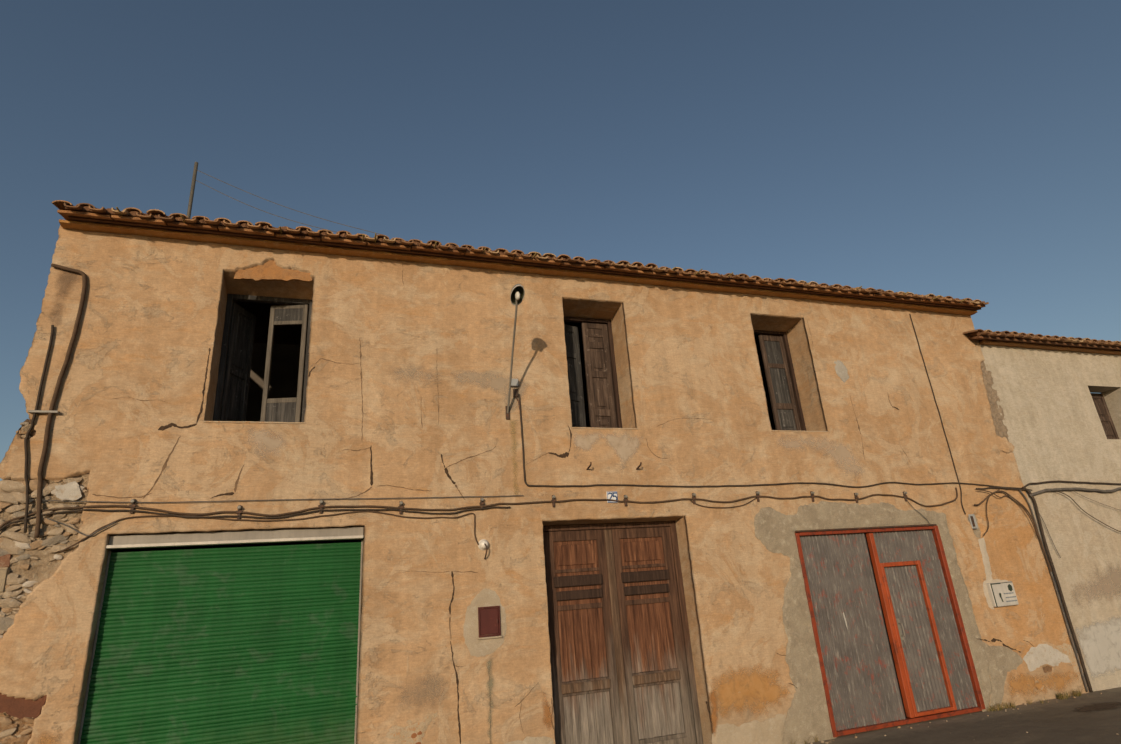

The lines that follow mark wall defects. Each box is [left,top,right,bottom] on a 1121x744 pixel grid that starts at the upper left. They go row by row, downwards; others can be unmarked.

spalling [0,473,90,640]
crack [92,348,211,498]
crack [210,464,245,499]
crack [308,339,496,500]
crack [526,426,572,465]
spalling [0,693,47,719]
crack [395,570,554,744]
peeling [1023,643,1084,677]